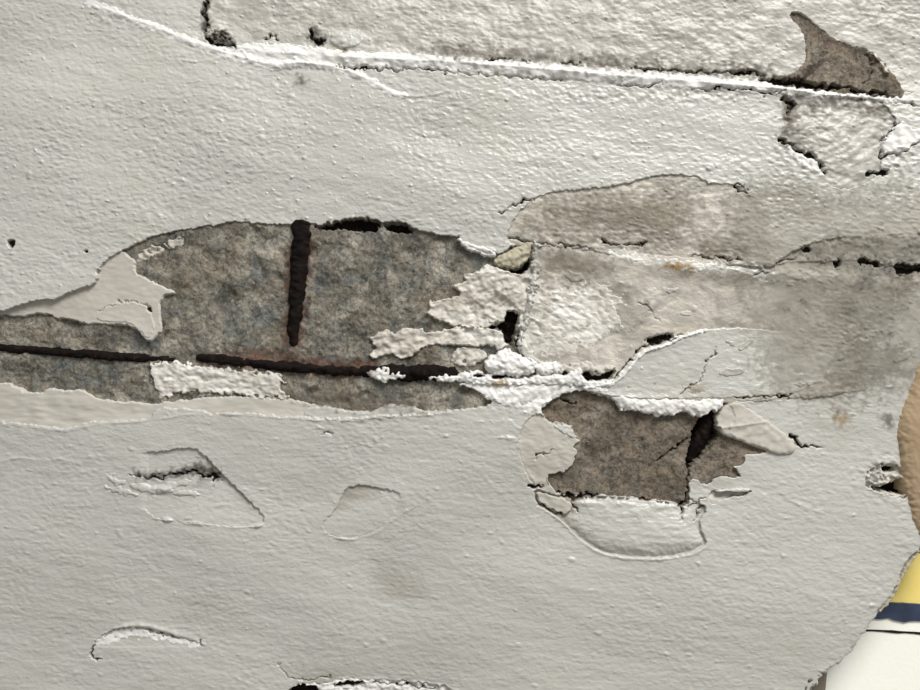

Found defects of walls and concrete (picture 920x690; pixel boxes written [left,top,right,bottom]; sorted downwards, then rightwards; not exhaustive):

crack [202,1,237,49]
crack [310,30,323,46]
crack [339,66,446,75]
peeling [203,0,920,189]
crack [623,69,887,98]
crack [833,258,920,269]
corrosion [204,247,374,377]
leakage [734,184,920,399]
spalling [0,174,920,558]